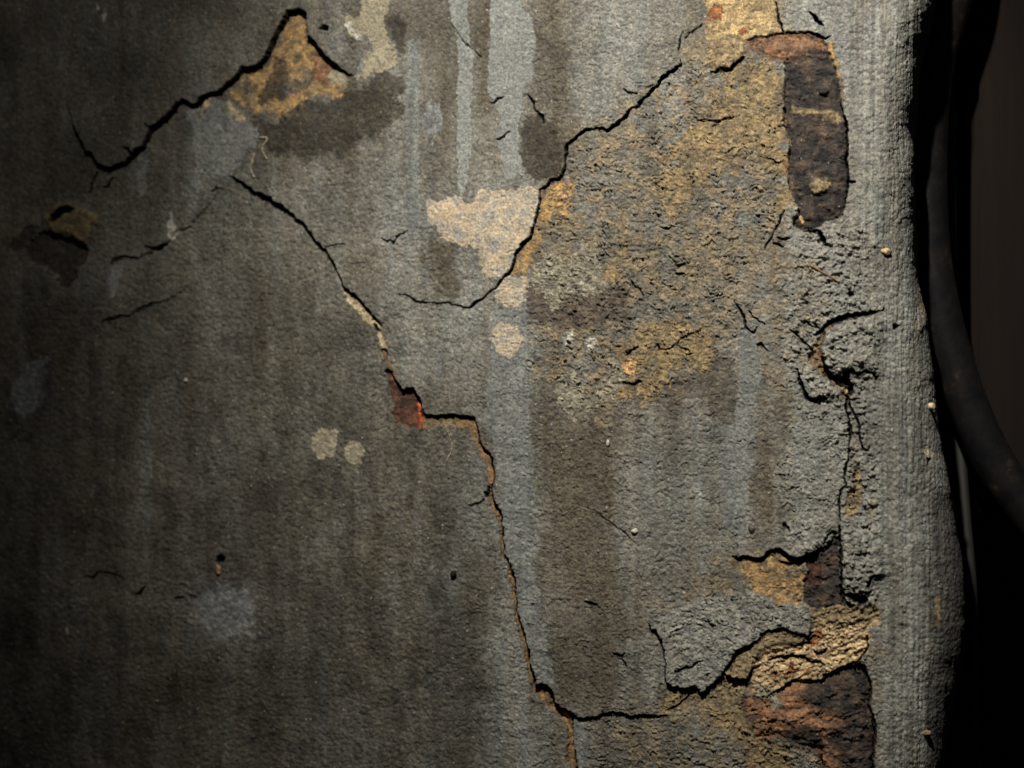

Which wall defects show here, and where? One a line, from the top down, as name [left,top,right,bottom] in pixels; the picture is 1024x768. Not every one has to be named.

flaking render [10,201,98,288]
crack [85,8,353,193]
flaking render [228,13,349,120]
crack [400,25,702,309]
flaking render [746,31,849,231]
crack [841,104,856,208]
water stain [343,0,632,690]
water stain [311,427,365,464]
crack [212,176,885,768]
flaking render [650,536,881,768]